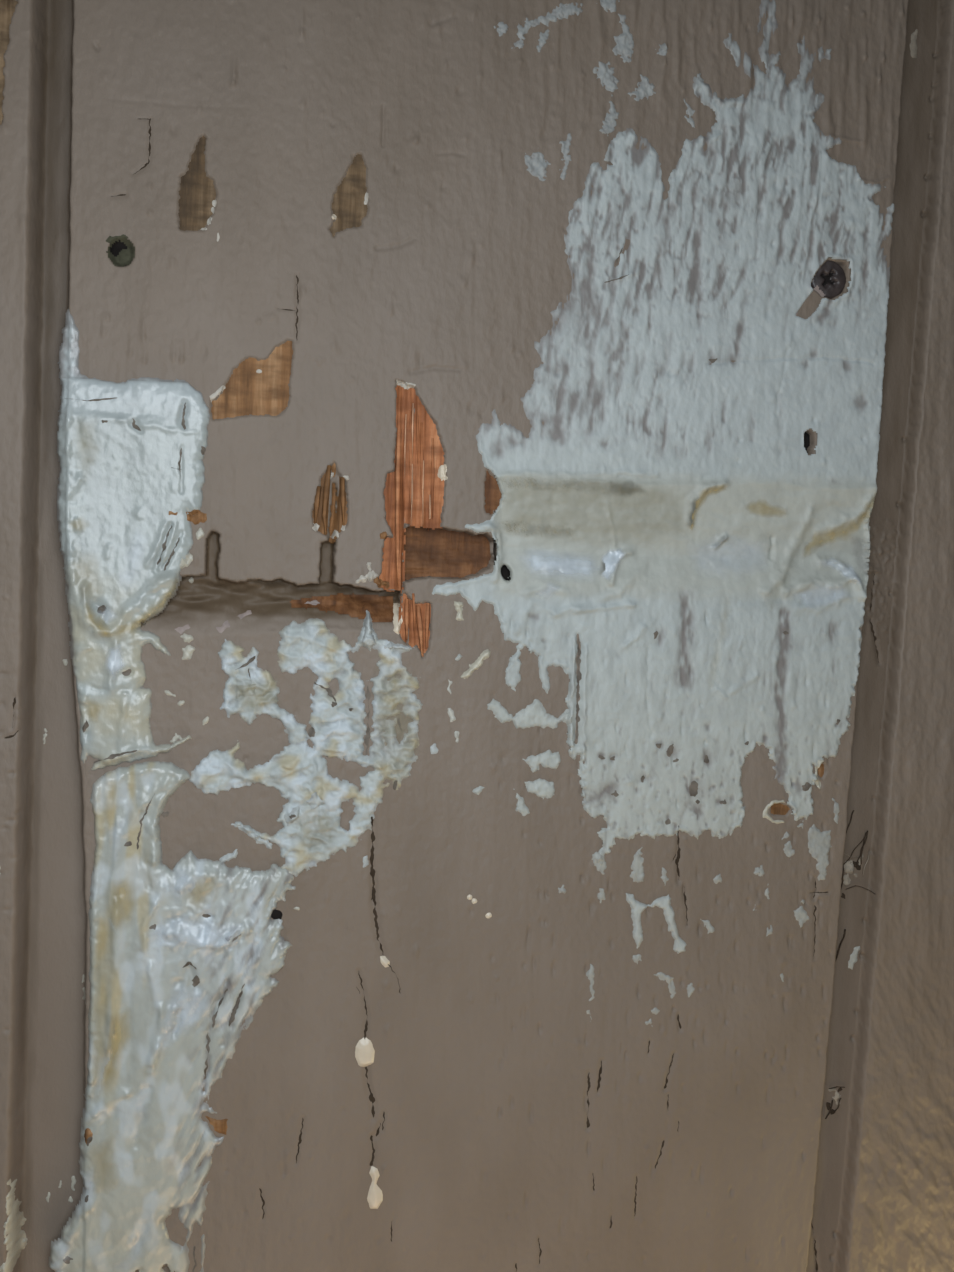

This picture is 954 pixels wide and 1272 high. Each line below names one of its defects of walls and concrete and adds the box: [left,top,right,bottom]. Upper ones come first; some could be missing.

peeling [494,0,656,136]
peeling [178,136,220,242]
peeling [329,154,368,237]
peeling [210,341,293,420]
peeling [484,471,502,515]
peeling [362,603,415,651]
peeling [447,649,491,743]
peeling [487,699,572,729]
peeling [513,750,561,816]
peeling [763,798,840,880]
spalling [271,907,300,919]
crack [356,817,400,1166]